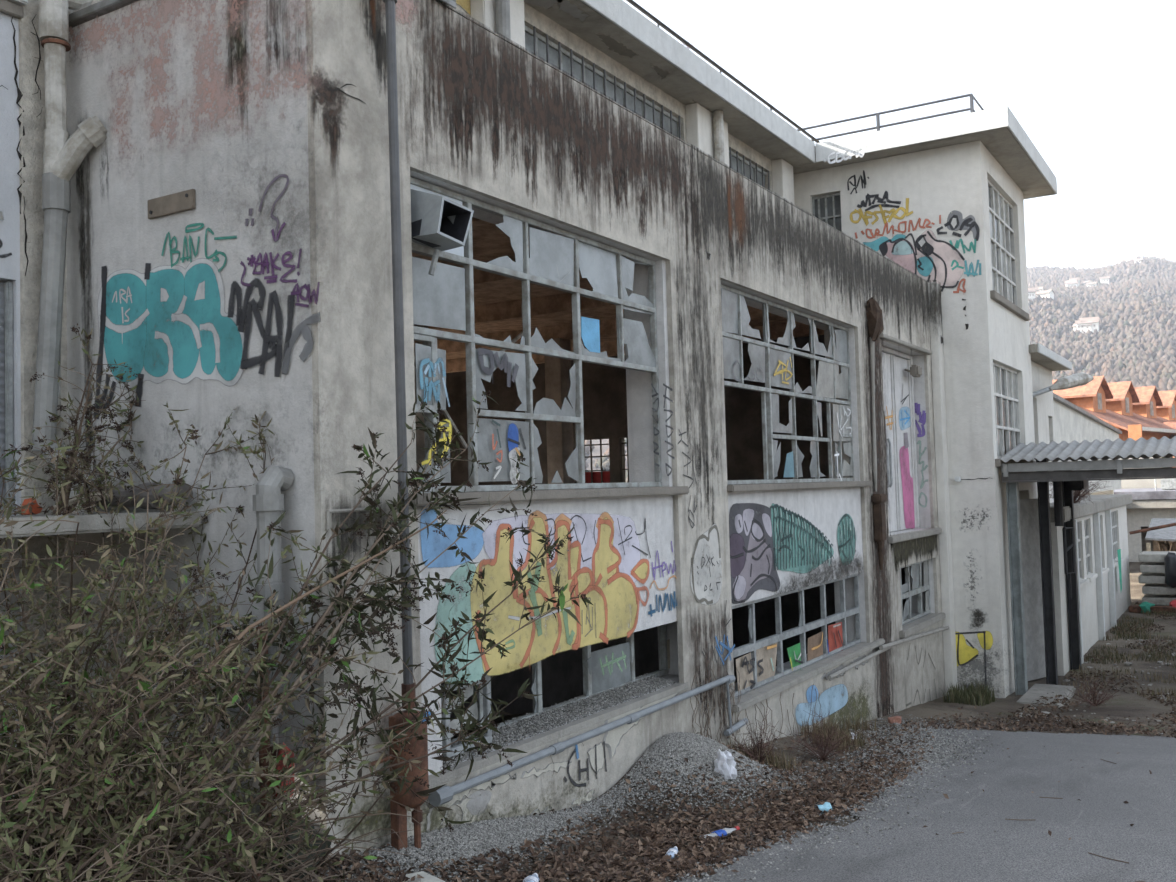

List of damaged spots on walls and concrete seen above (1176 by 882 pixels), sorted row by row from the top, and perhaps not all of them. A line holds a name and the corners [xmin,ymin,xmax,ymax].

damp [225,0,248,112]
damp [268,0,287,62]
damp [366,0,387,73]
crack [0,14,43,276]
damp [310,71,345,166]
damp [410,0,943,727]